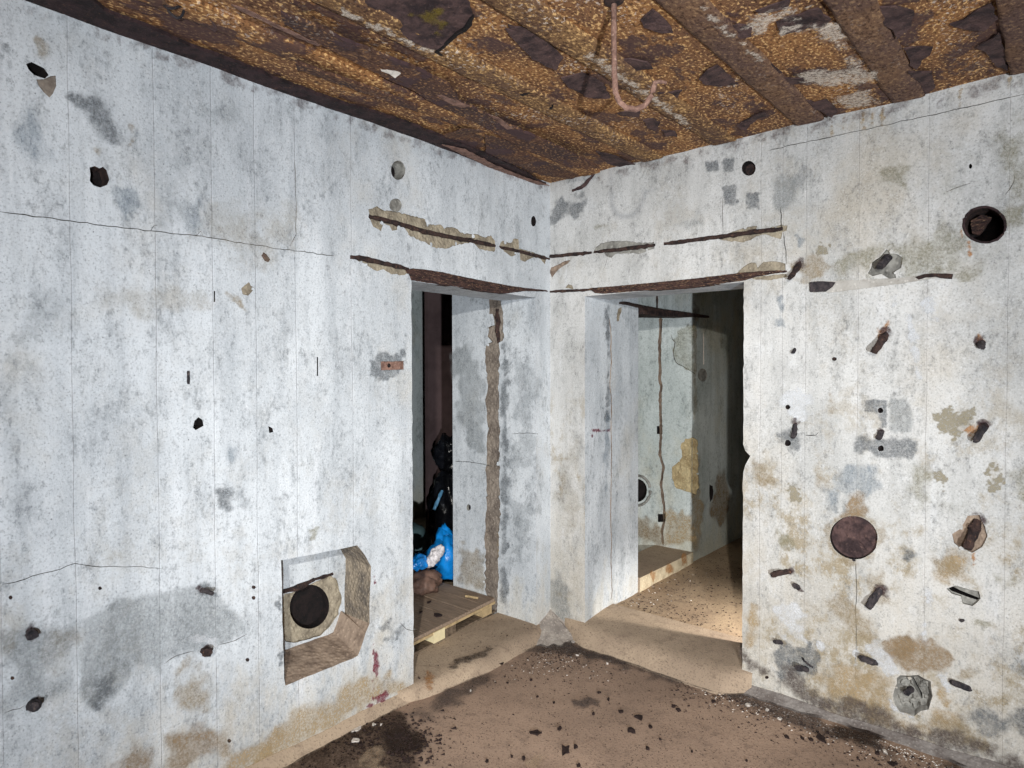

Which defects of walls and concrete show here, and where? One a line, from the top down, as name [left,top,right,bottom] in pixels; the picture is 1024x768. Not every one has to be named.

rust [25,0,600,186]
crack [3,170,333,256]
spalling [368,206,570,277]
spalling [868,249,903,279]
spalling [483,299,504,612]
spalling [672,437,699,495]
spalling [952,512,987,553]
spalling [282,576,342,643]
spalling [947,585,981,606]
spalling [893,675,933,718]